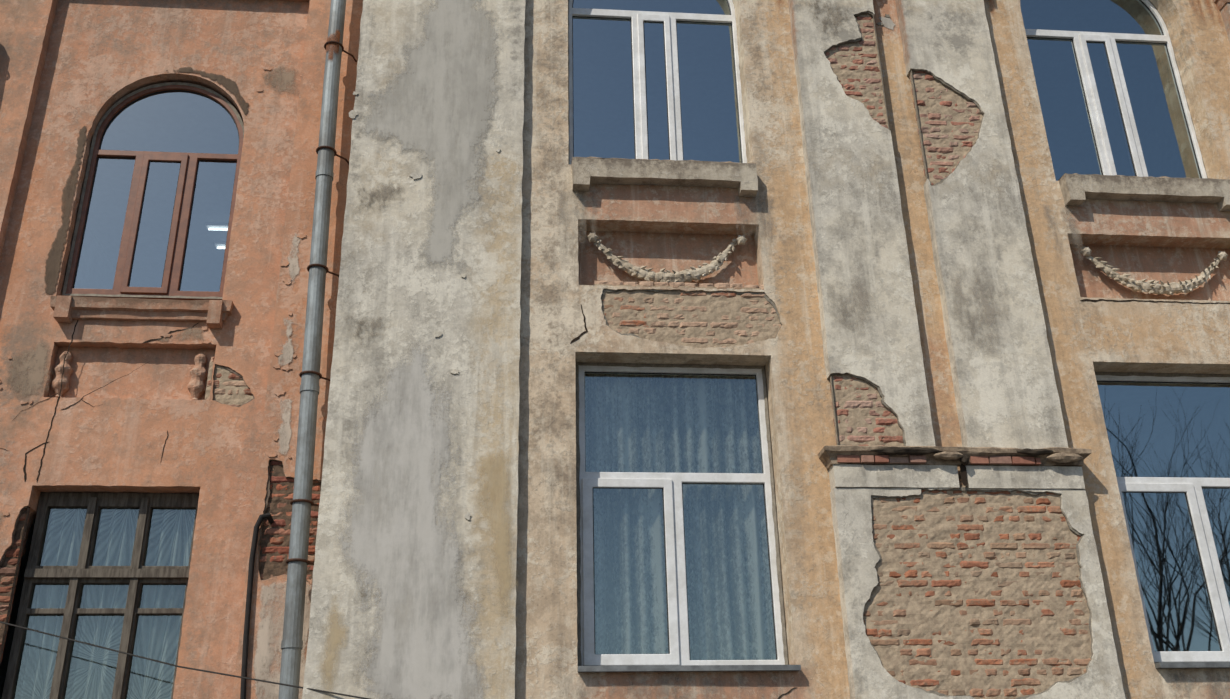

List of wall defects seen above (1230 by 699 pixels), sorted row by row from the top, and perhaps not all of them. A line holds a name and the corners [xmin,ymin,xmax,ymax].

flaking render [44,126,86,294]
damp [361,185,400,207]
flaking render [824,11,895,130]
flaking render [909,69,984,186]
crack [0,320,198,481]
flaking render [160,325,255,407]
flaking render [594,281,782,348]
flaking render [830,373,906,446]
flaking render [0,506,30,663]
flaking render [253,391,294,699]
flaking render [298,480,322,699]
flaking render [863,479,1093,699]